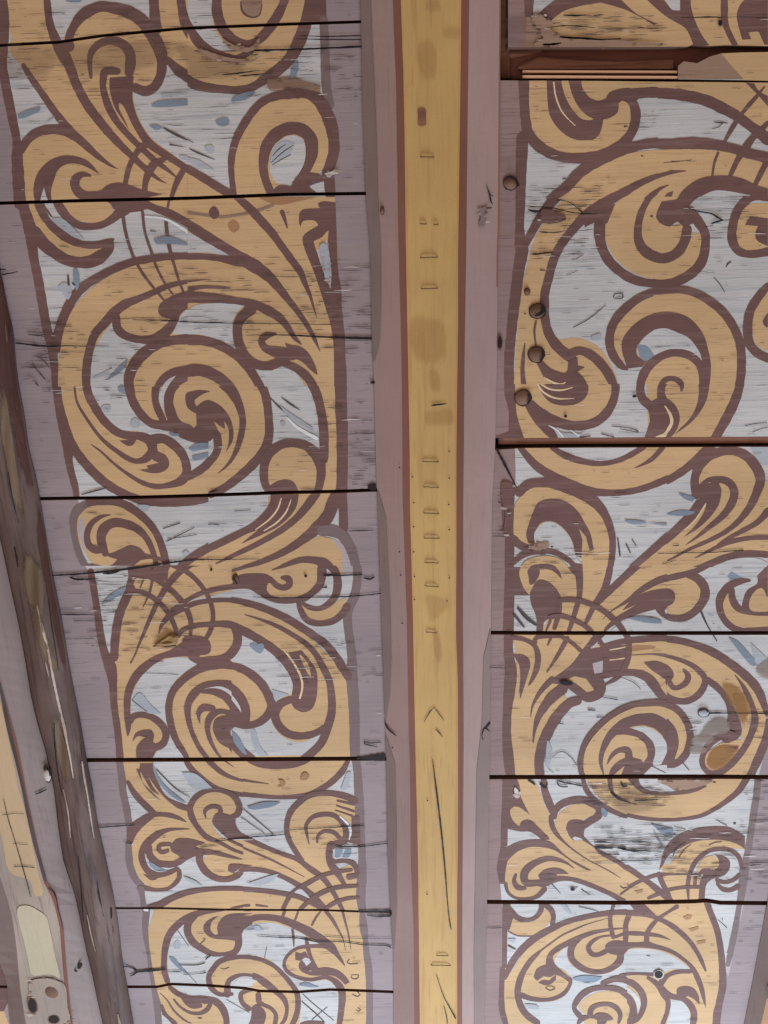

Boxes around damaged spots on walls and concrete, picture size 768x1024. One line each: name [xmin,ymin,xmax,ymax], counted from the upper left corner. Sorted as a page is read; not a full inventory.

leakage [689,685,750,769]